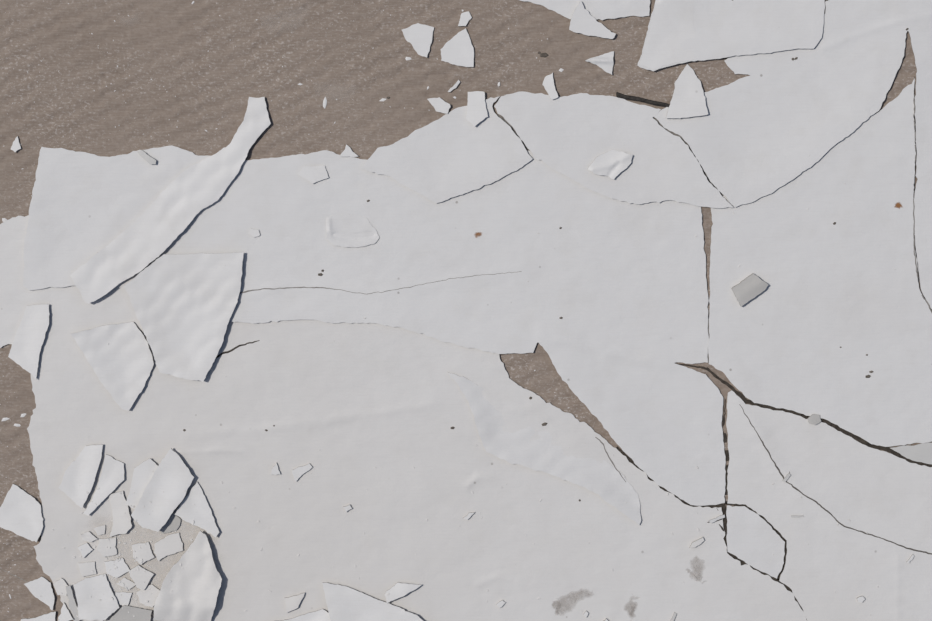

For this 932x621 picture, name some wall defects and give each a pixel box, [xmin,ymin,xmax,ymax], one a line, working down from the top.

peeling [0,304,74,621]
peeling [83,454,158,516]
peeling [71,150,743,506]
peeling [0,0,932,309]
crack [595,321,932,620]
crack [913,76,932,313]